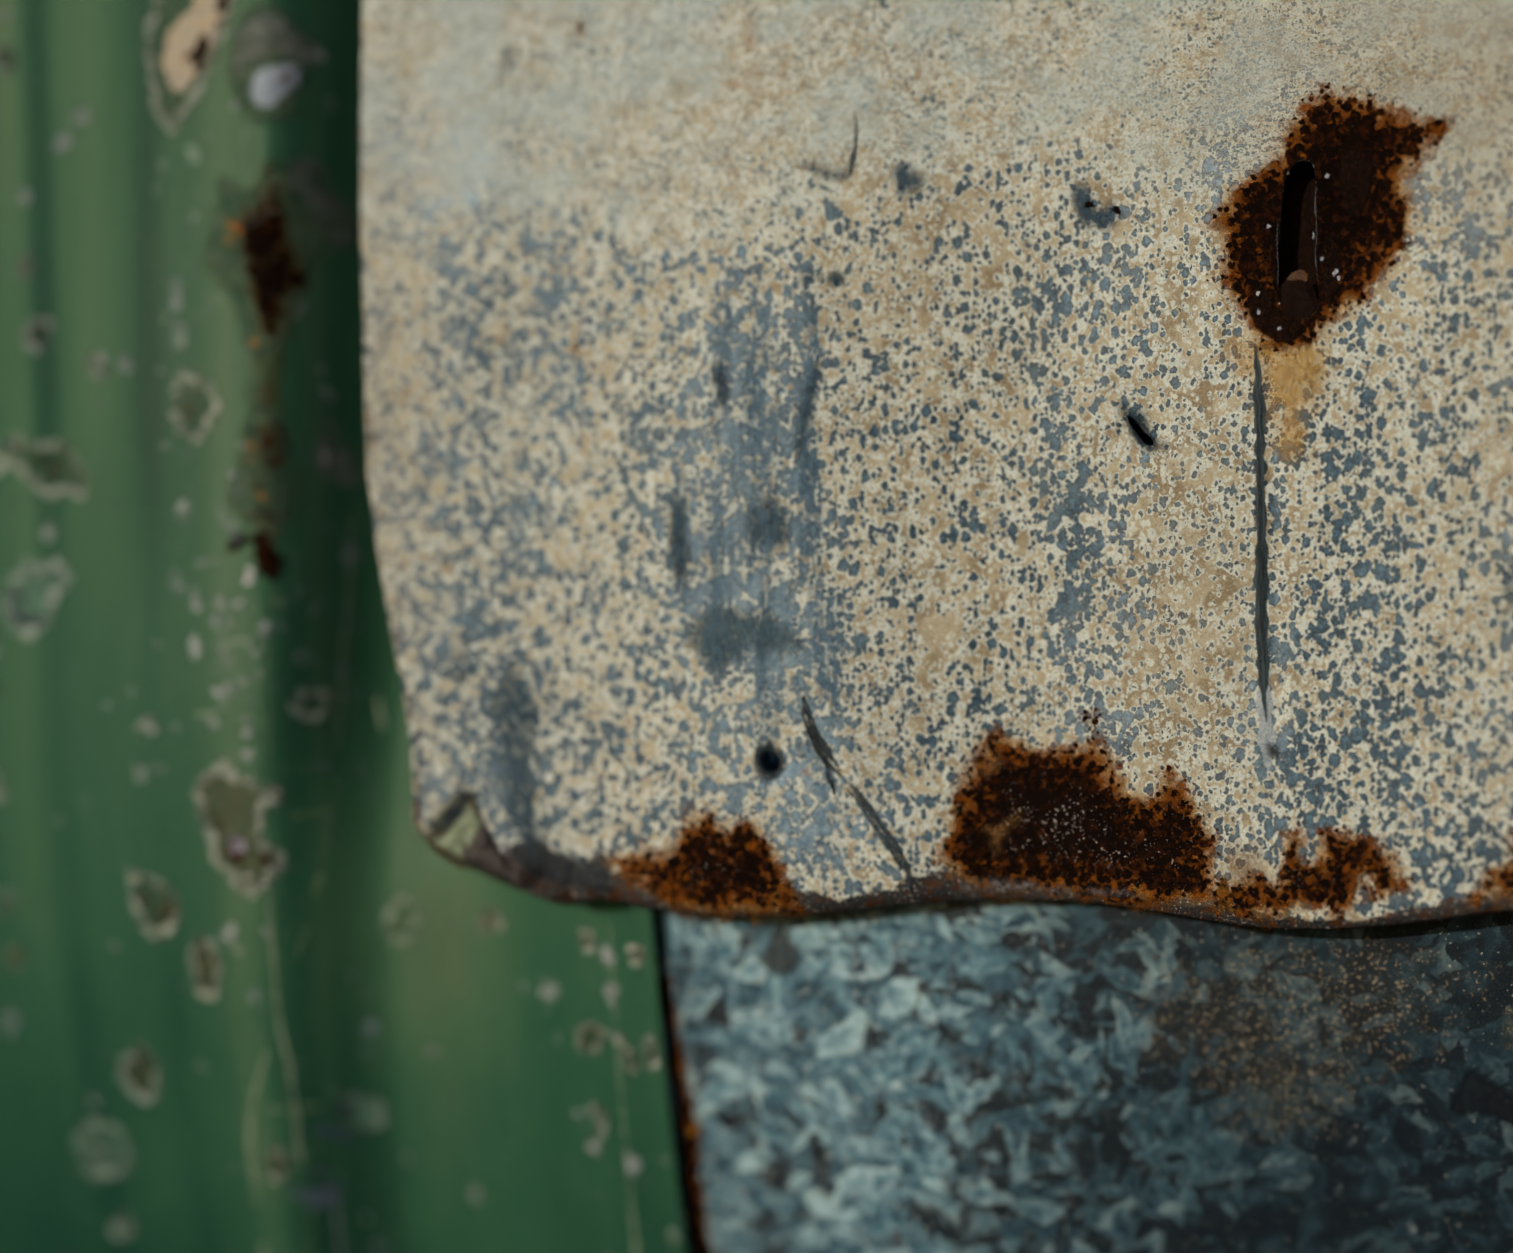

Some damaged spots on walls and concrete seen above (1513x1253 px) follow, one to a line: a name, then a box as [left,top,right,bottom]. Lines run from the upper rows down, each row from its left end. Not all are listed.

peeling [146,0,314,133]
rust [226,181,307,345]
rust [1206,82,1458,356]
rust [607,799,808,924]
rust [931,707,1414,926]
rust [1467,826,1513,914]
rust [655,937,715,1253]